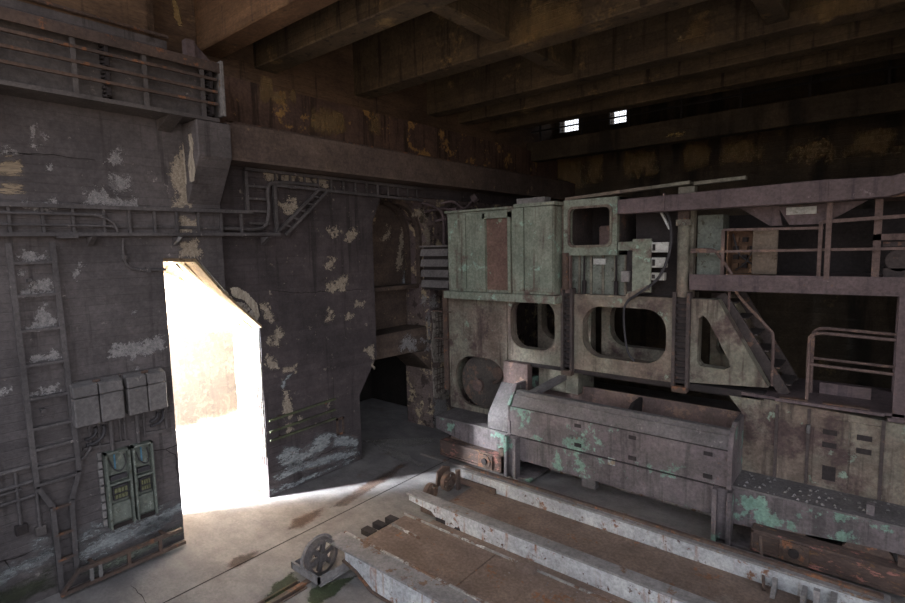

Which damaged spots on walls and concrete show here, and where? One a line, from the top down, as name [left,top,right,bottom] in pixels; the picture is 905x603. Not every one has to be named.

peeling [80,172,139,212]
peeling [166,133,204,264]
peeling [106,333,167,371]
spalling [225,287,297,465]
peeling [282,389,303,434]
water stain [270,431,433,495]